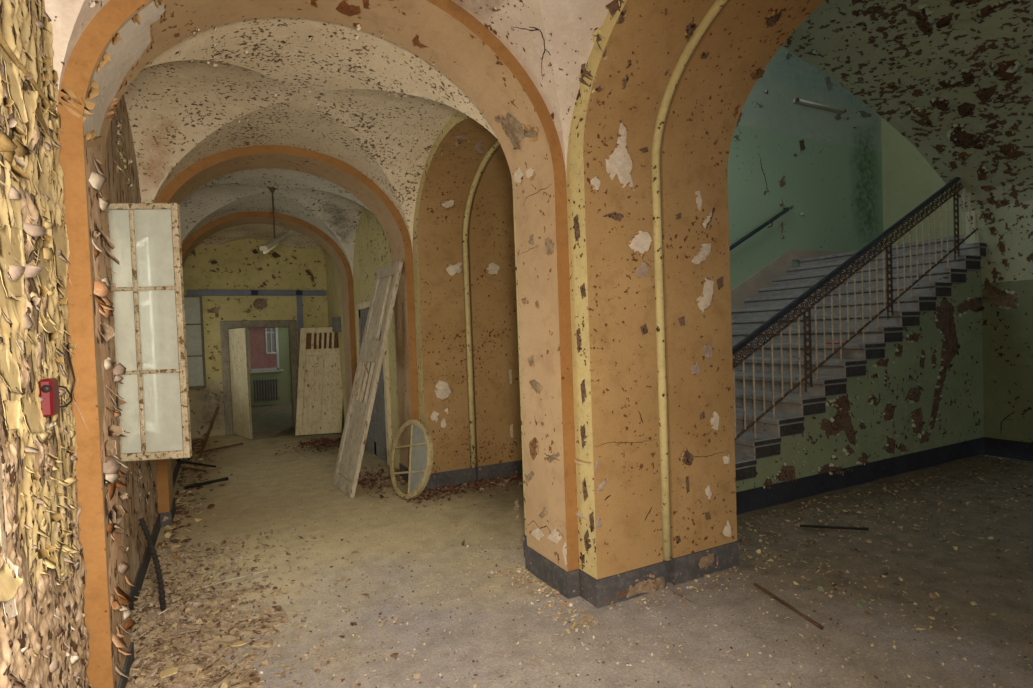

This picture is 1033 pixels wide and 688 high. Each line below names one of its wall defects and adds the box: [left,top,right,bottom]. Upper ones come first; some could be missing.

peeling [323,0,371,41]
peeling [605,0,627,25]
peeling [684,22,697,42]
peeling [578,63,602,93]
peeling [495,112,539,150]
peeling [590,120,648,191]
peeling [627,230,666,278]
peeling [692,243,712,264]
peeling [696,276,724,313]
peeling [762,278,1019,490]
peeling [429,380,453,430]
peeling [680,448,694,493]